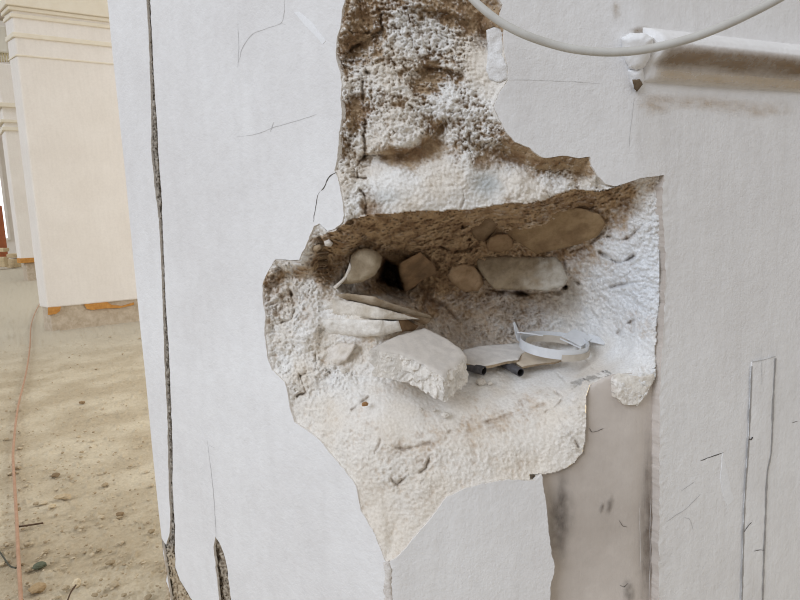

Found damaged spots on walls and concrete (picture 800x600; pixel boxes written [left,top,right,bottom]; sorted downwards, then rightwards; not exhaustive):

crack [148,0,192,600]
crack [207,443,231,600]
spalling [263,0,660,600]